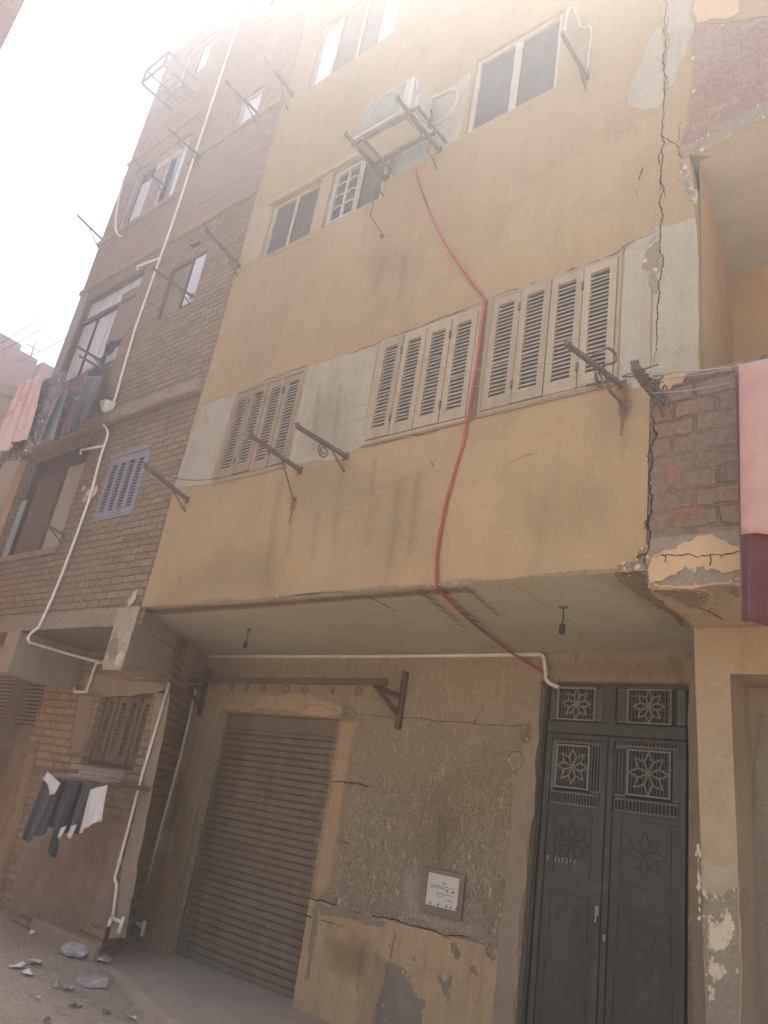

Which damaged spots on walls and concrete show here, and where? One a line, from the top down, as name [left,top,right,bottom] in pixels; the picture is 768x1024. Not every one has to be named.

flaking render [627,0,768,205]
crack [566,0,682,353]
crack [634,409,740,565]
flaking render [426,545,741,628]
crack [360,714,522,726]
crack [332,779,371,787]
crack [304,897,484,959]
peeling [695,844,742,1024]
flaking render [373,956,426,1024]